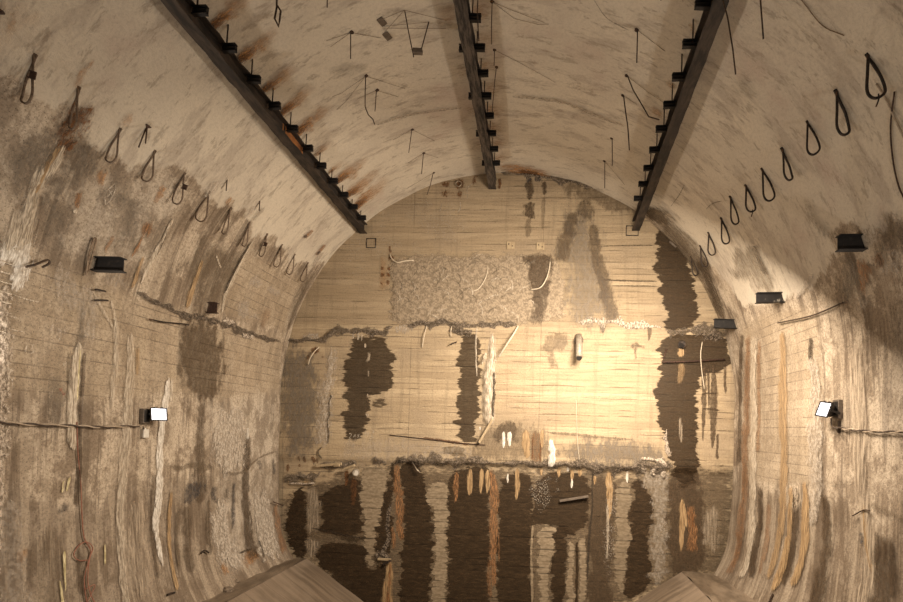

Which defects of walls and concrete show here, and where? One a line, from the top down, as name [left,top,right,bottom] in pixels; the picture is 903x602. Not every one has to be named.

corrosion [281,96,316,154]
corrosion [348,182,374,209]
spalling [389,252,565,337]
leakage [178,315,235,400]